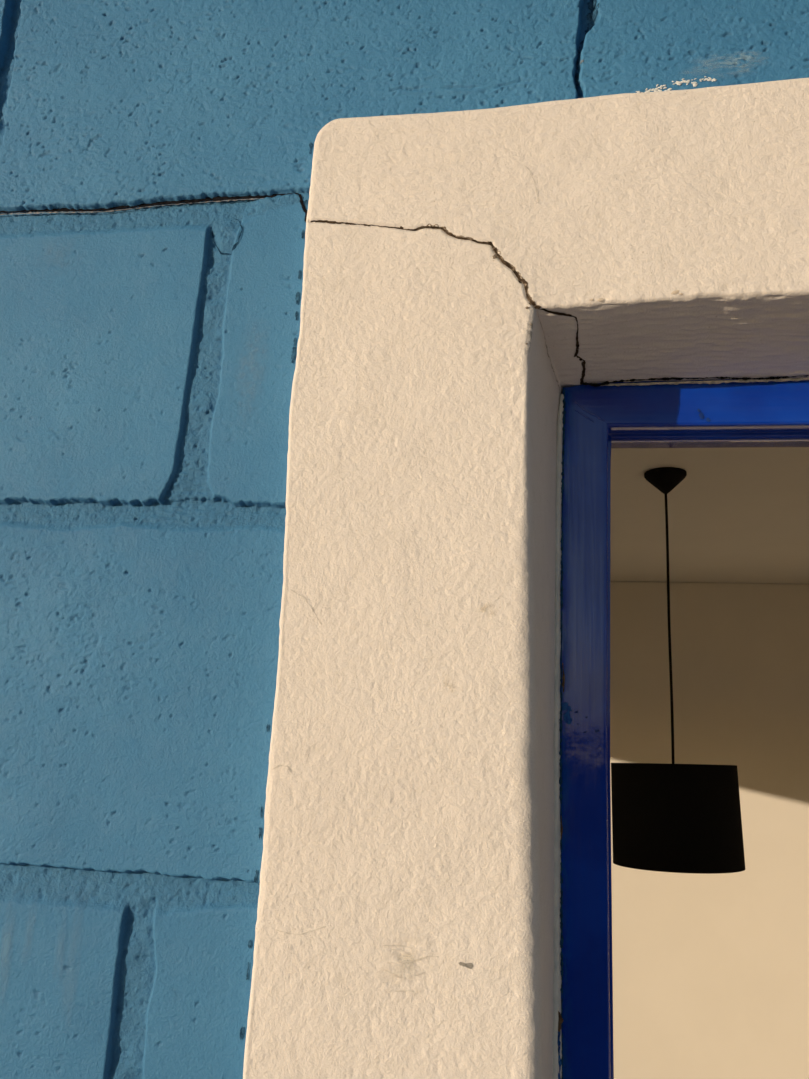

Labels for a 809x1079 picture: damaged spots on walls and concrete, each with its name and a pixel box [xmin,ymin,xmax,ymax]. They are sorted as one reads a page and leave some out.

crack [575,0,599,86]
crack [0,193,809,824]
crack [558,839,566,1079]